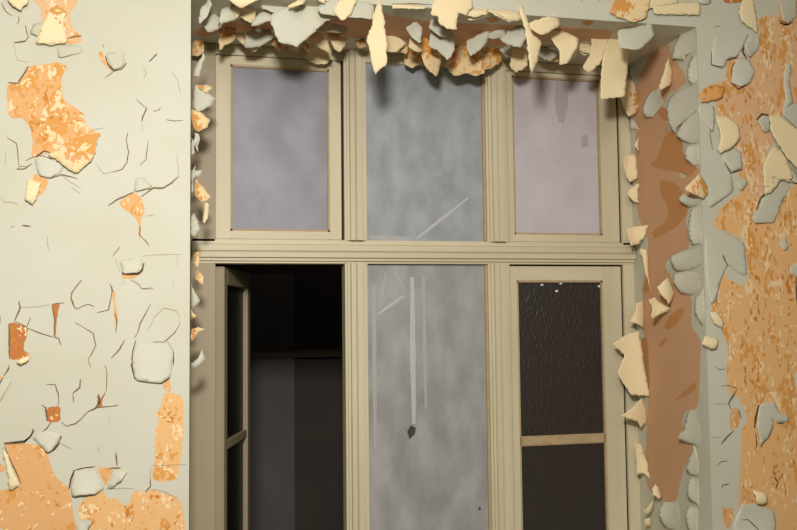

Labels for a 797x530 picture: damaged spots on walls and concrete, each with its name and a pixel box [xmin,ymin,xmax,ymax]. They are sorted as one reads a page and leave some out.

crack [1,3,29,84]
crack [103,46,157,80]
peeling [6,62,95,196]
crack [97,99,183,174]
peeling [119,193,145,238]
crack [109,155,179,205]
peeling [190,0,797,530]
peeling [9,323,29,360]
crack [0,215,180,489]
peeling [0,380,186,530]
crack [111,464,184,498]